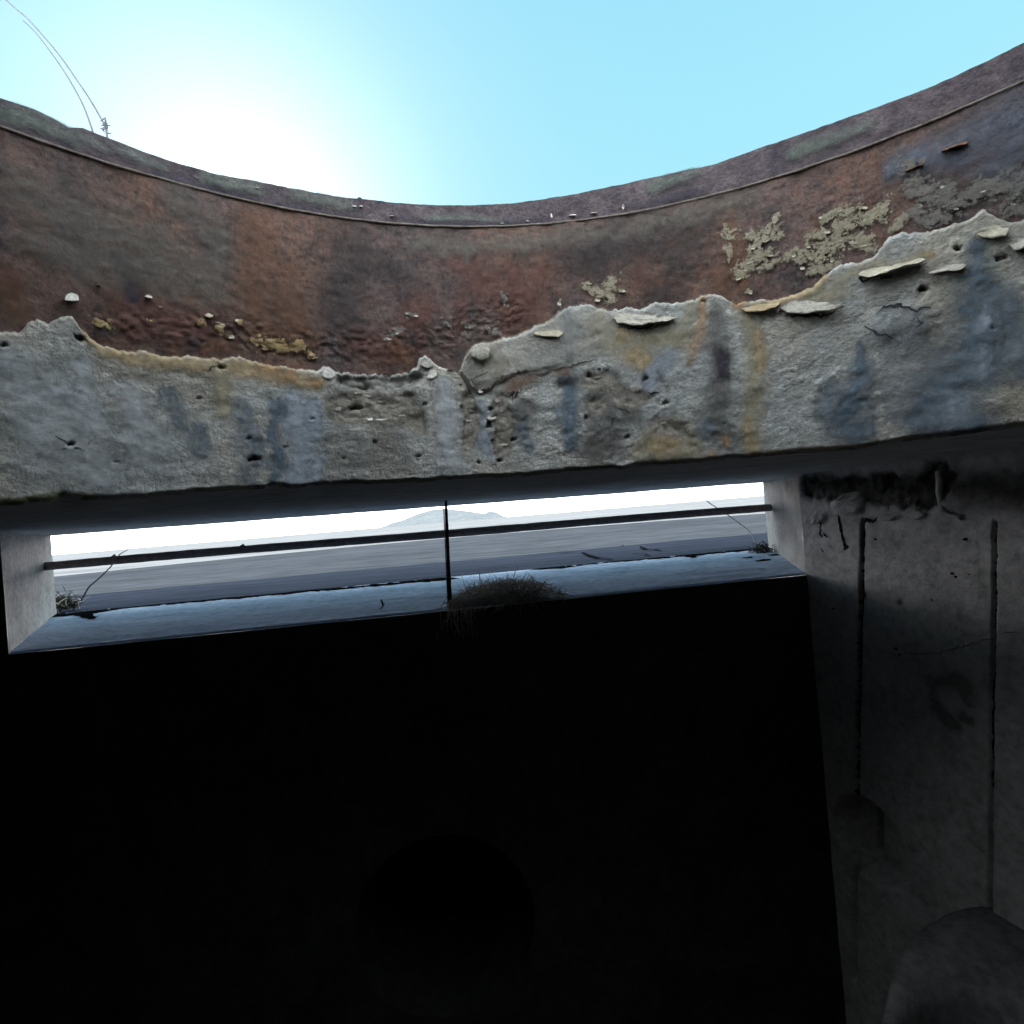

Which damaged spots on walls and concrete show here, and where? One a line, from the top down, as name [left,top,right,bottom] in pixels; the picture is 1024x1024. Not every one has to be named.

peeling [716,153,1024,318]
water stain [0,349,122,500]
water stain [110,387,210,466]
corrosion [85,288,324,418]
peeling [196,313,242,339]
water stain [235,389,323,489]
peeling [250,333,317,359]
crack [432,359,594,474]
water stain [555,349,673,459]
peeling [582,271,676,330]
water stain [814,340,876,449]
spalling [804,474,950,526]